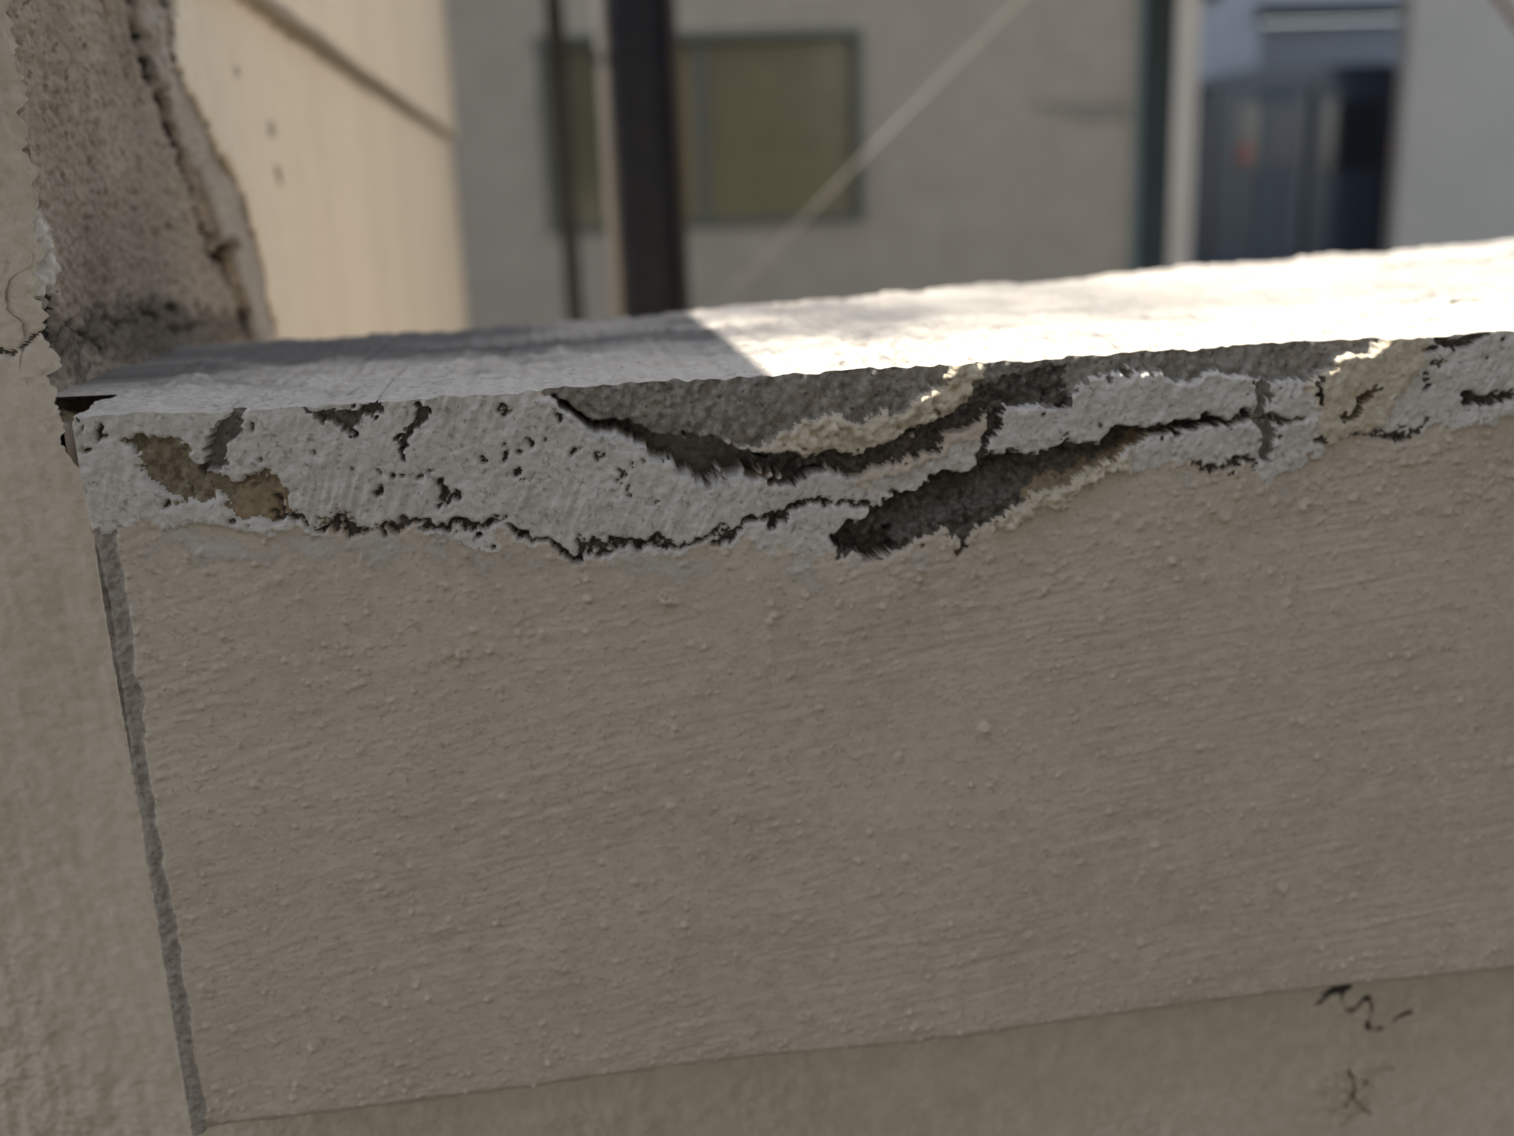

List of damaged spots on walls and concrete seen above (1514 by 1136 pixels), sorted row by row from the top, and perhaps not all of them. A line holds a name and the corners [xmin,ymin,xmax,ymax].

crack [0,0,250,377]
peeling [4,0,1514,566]
crack [271,493,899,562]